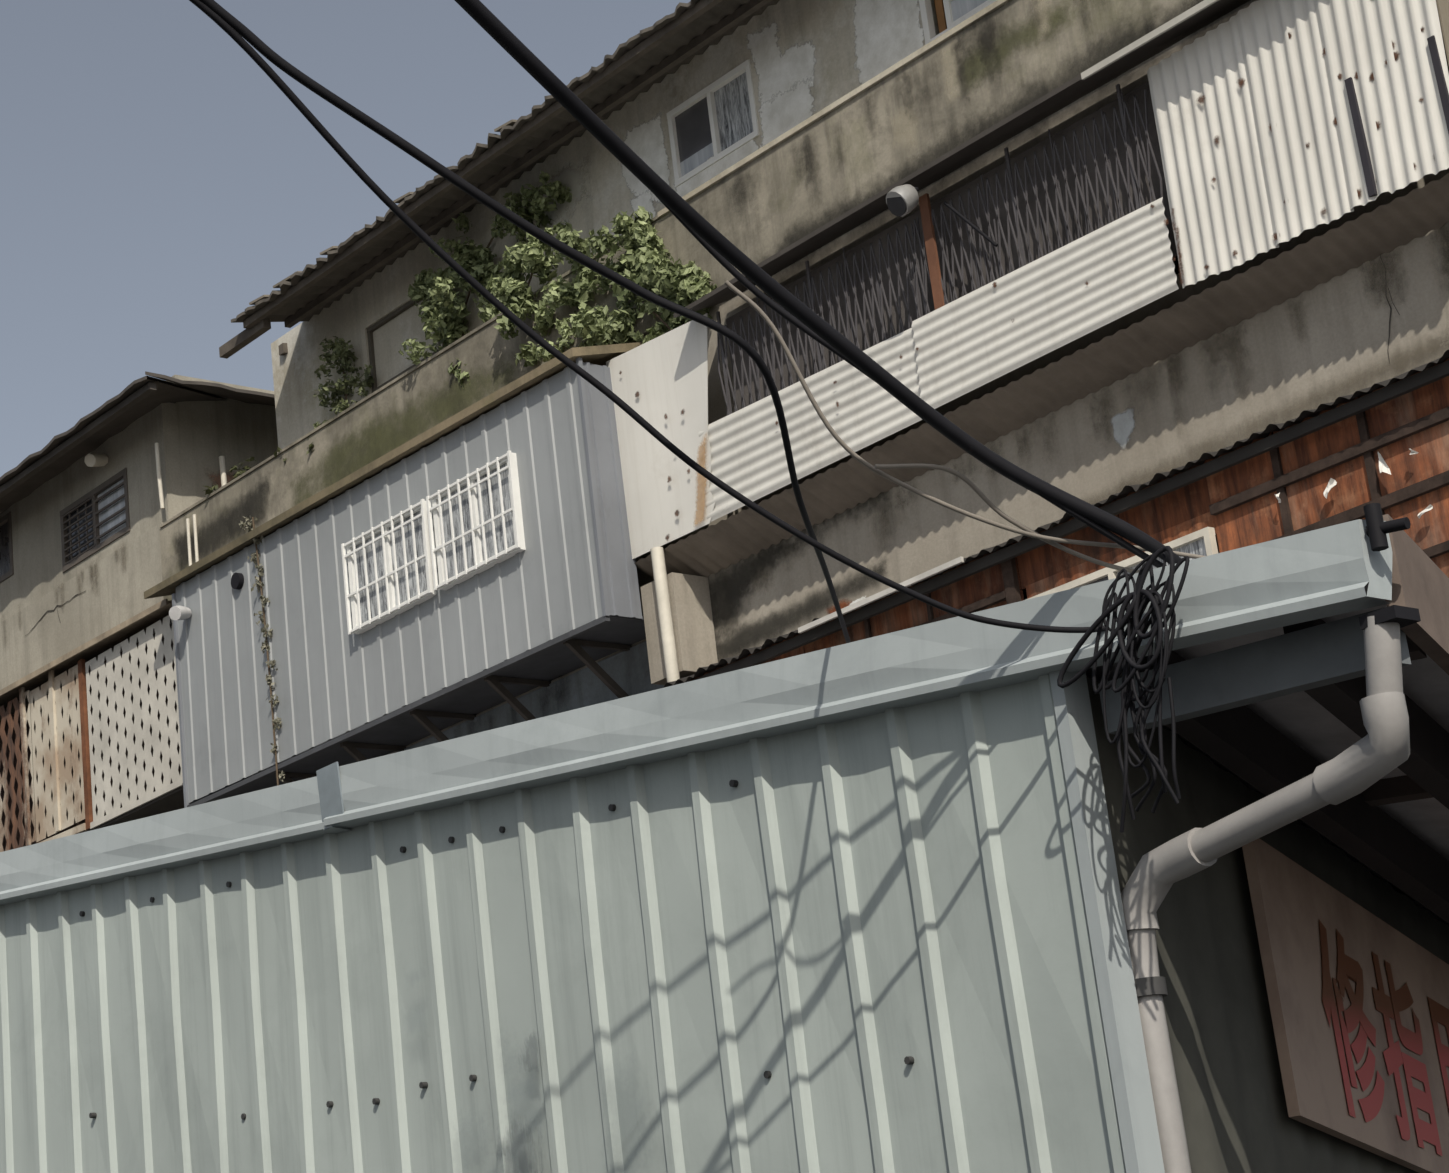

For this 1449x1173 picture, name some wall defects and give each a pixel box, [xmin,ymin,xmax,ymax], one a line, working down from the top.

peeling [621,23,817,220]
peeling [853,0,924,84]
damp [764,0,1204,275]
rust [1337,42,1399,81]
damp [1089,337,1449,504]
crack [25,591,85,636]